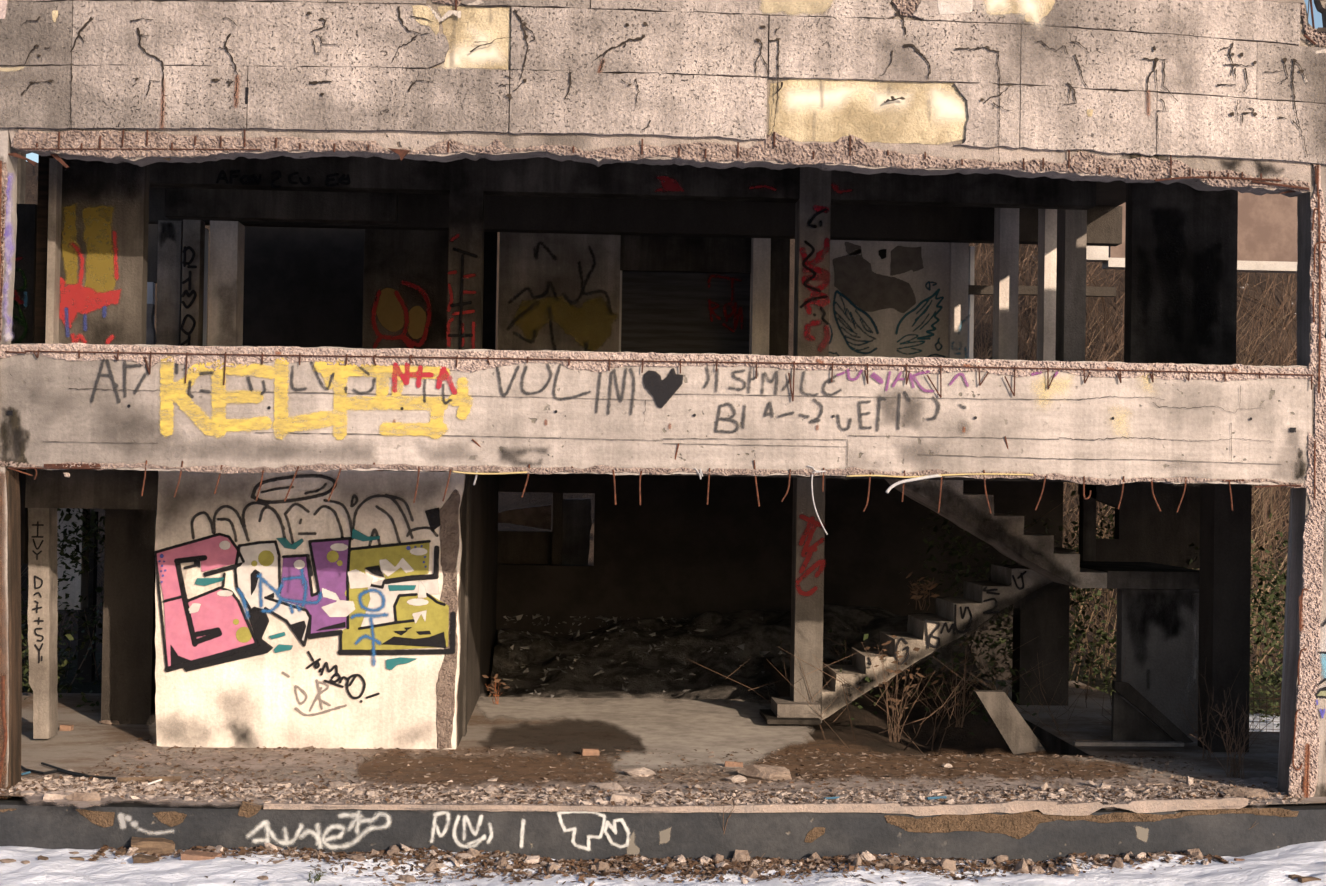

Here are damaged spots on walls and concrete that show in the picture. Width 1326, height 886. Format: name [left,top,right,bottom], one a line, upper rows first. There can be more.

crack [130,18,164,127]
spalling [11,129,393,158]
crack [211,18,238,106]
peeling [412,0,511,70]
crack [565,22,651,130]
spalling [400,78,1311,191]
crack [879,11,1012,168]
peeling [938,0,1055,22]
crack [1143,46,1177,151]
crack [1217,42,1308,157]
spalling [0,161,1326,798]
spalling [884,804,1299,842]